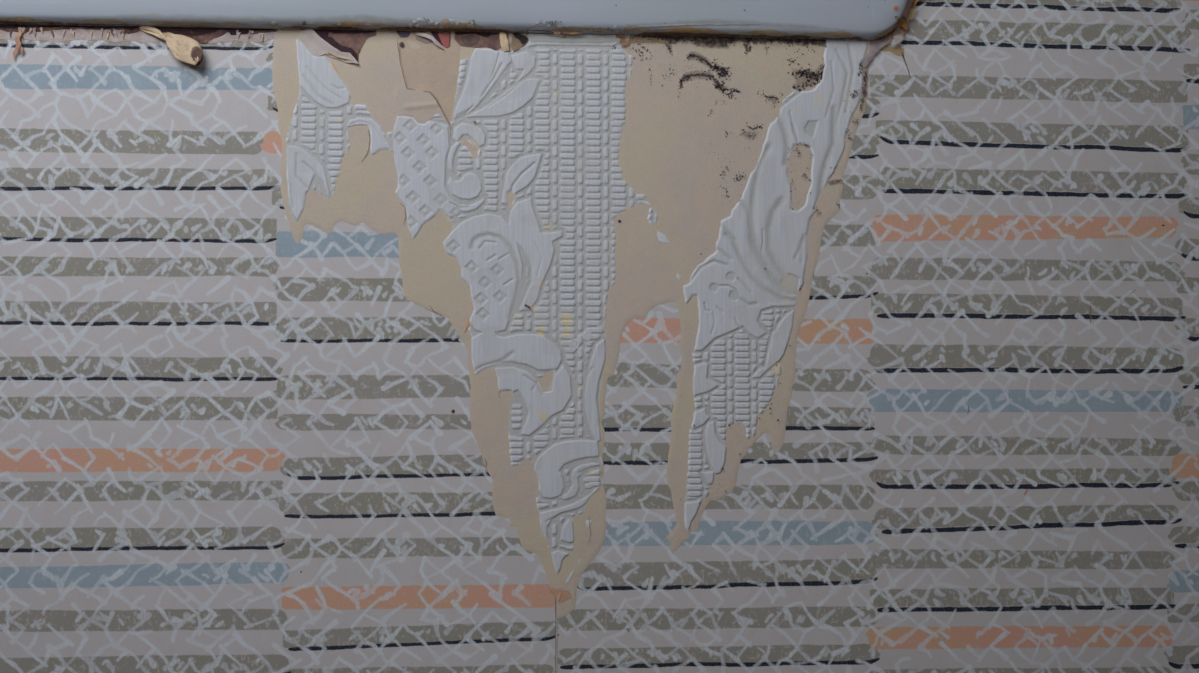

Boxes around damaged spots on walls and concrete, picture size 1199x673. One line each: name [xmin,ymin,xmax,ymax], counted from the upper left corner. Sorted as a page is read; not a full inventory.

water stain [0,17,127,26]
flaking render [184,21,278,43]
flaking render [328,23,377,59]
water stain [285,22,528,62]
peeling [397,17,754,51]
water stain [555,21,904,116]